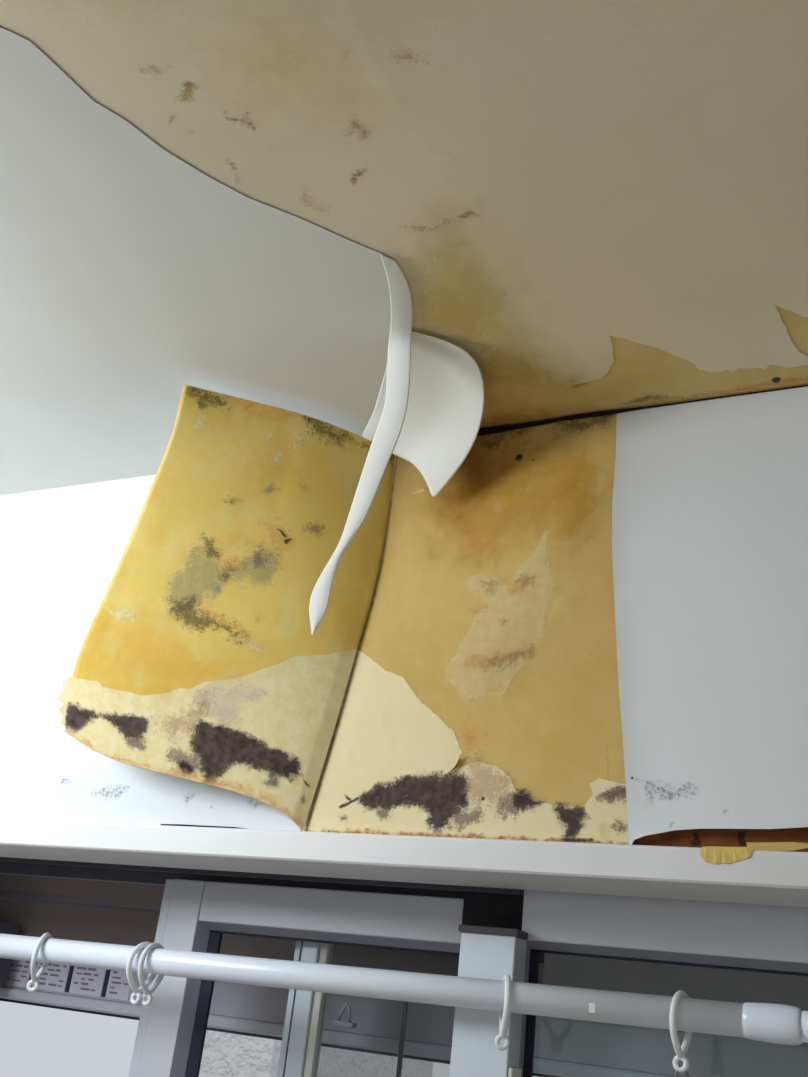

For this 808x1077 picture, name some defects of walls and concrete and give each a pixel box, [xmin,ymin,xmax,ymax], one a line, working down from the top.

water stain [187,388,225,409]
peeling [0,0,808,852]
water stain [167,537,279,644]
water stain [65,703,148,750]
water stain [167,720,309,803]
crack [306,719,339,829]
water stain [339,771,484,832]
water stain [497,789,541,819]
water stain [554,802,589,839]
water stain [597,786,626,802]